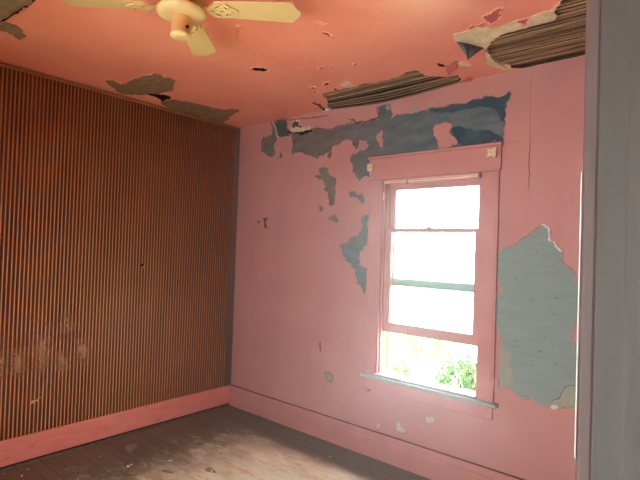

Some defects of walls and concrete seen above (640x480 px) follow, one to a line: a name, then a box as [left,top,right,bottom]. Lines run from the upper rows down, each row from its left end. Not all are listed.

peeling [0,0,38,41]
peeling [466,7,504,30]
peeling [104,72,241,123]
peeling [260,90,513,224]
peeling [338,214,369,295]
peeling [496,173,582,458]